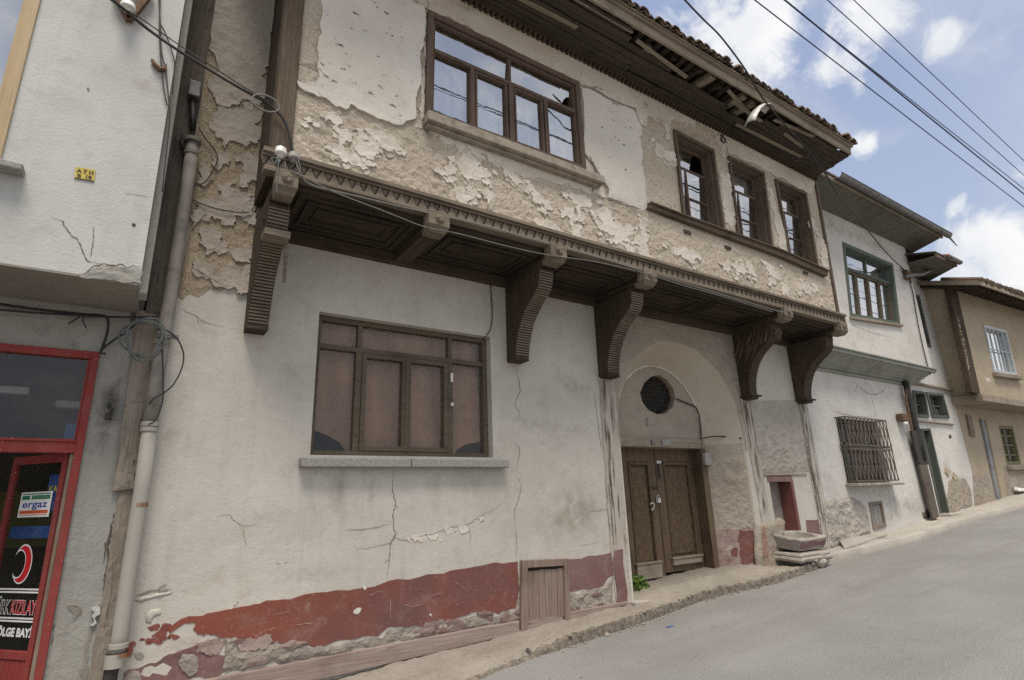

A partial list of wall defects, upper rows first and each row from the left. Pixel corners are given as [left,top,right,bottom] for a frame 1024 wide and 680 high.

peeling [177,0,275,300]
spalling [292,0,836,311]
crack [51,217,140,276]
crack [354,441,521,595]
spalling [944,464,1024,513]